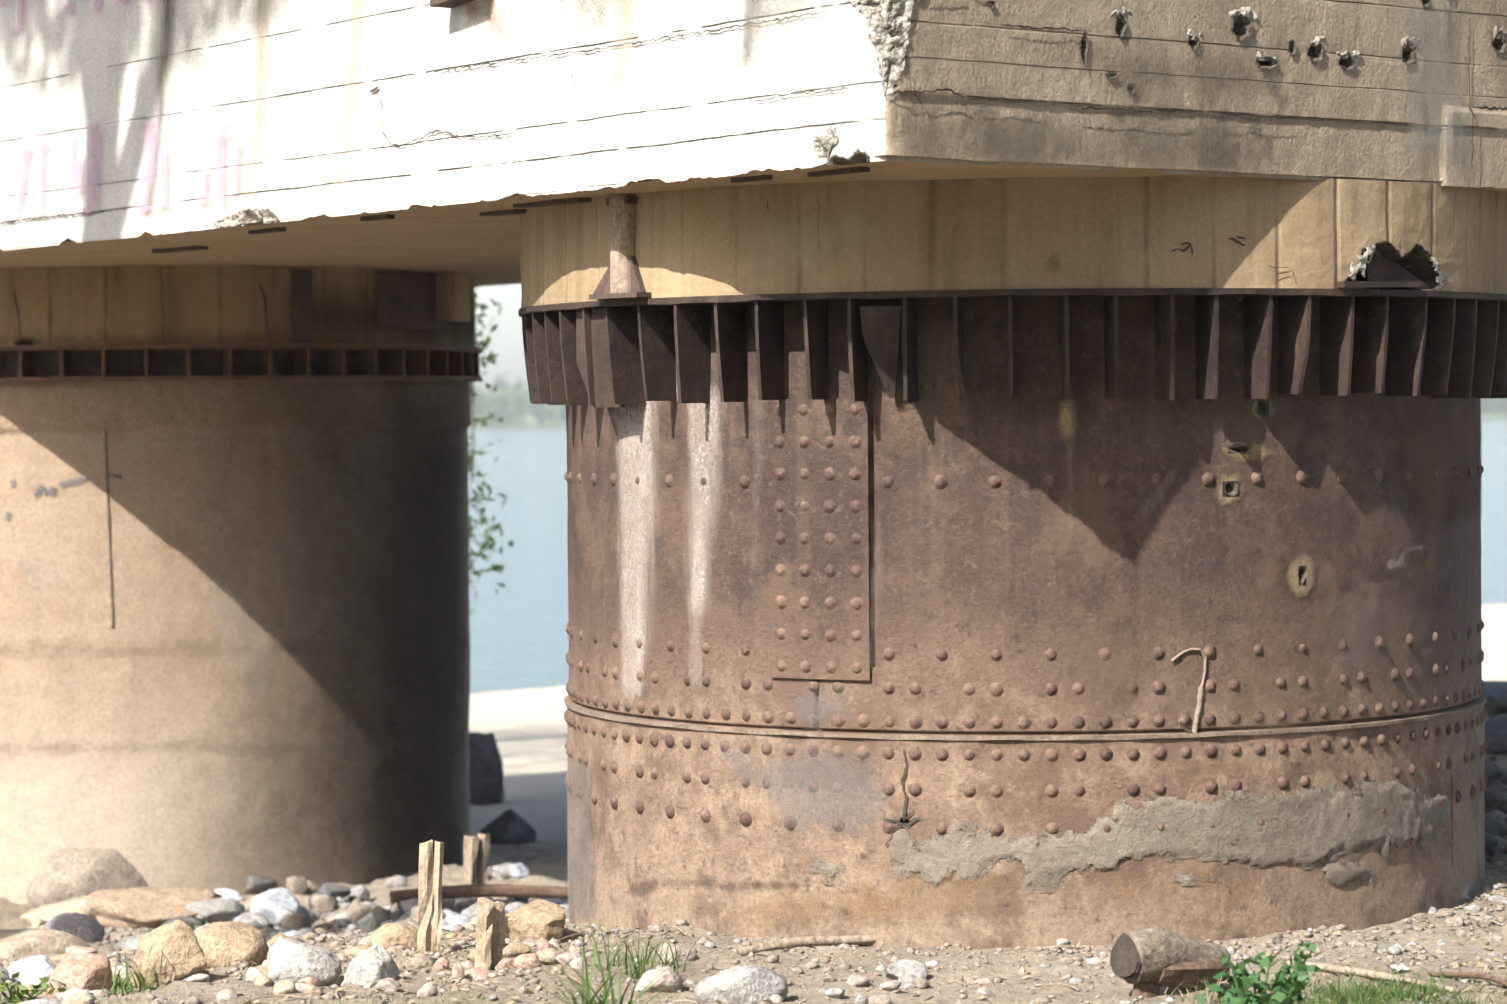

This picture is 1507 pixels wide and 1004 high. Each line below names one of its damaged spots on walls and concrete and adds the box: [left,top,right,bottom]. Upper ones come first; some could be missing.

spalling [848,0,921,103]
spalling [1079,31,1089,66]
spalling [1111,6,1131,38]
spalling [1228,7,1360,70]
spalling [1401,35,1421,65]
spalling [1489,26,1507,54]
spalling [1337,241,1446,291]
rust [1060,400,1074,440]
rust [1227,443,1265,460]
rust [1219,475,1238,503]
rust [1290,557,1312,595]
crack [883,749,921,846]